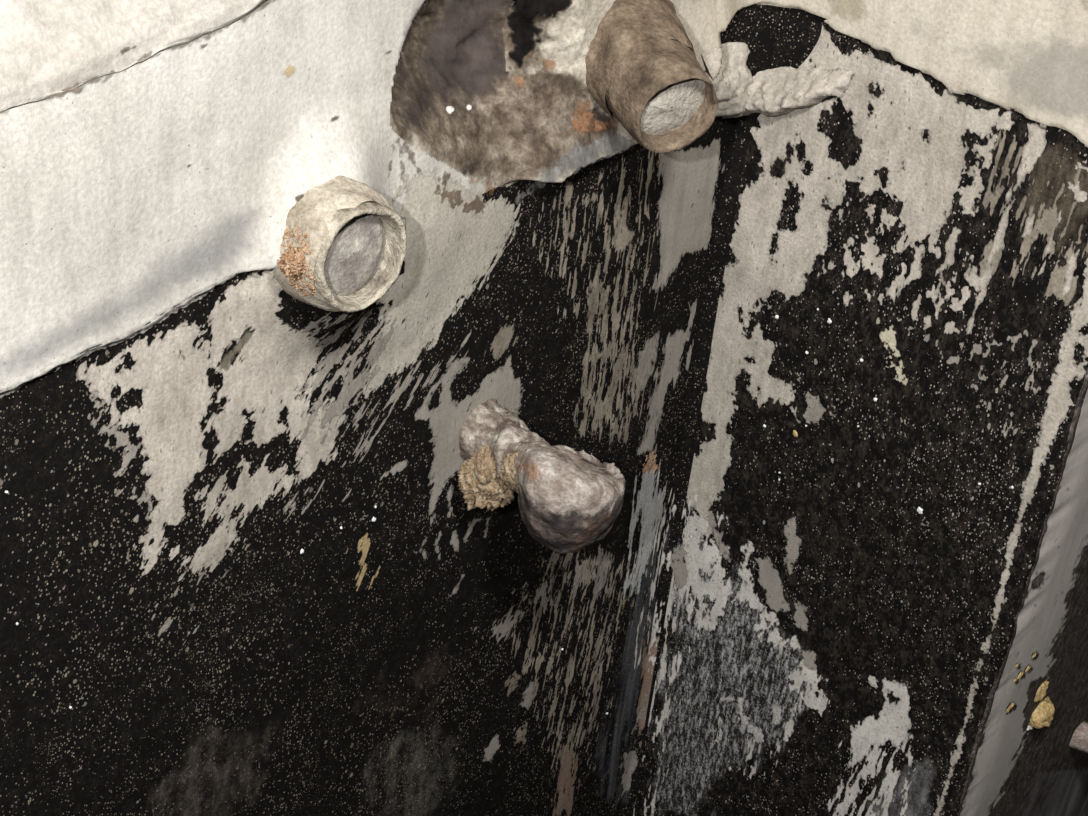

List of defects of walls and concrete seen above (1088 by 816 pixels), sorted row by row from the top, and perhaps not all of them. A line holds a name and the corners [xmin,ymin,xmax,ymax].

rust [277,224,317,297]
peeling [76,0,725,637]
peeling [686,23,1088,816]
peeling [483,735,501,762]
peeling [491,544,650,780]
peeling [618,751,638,801]